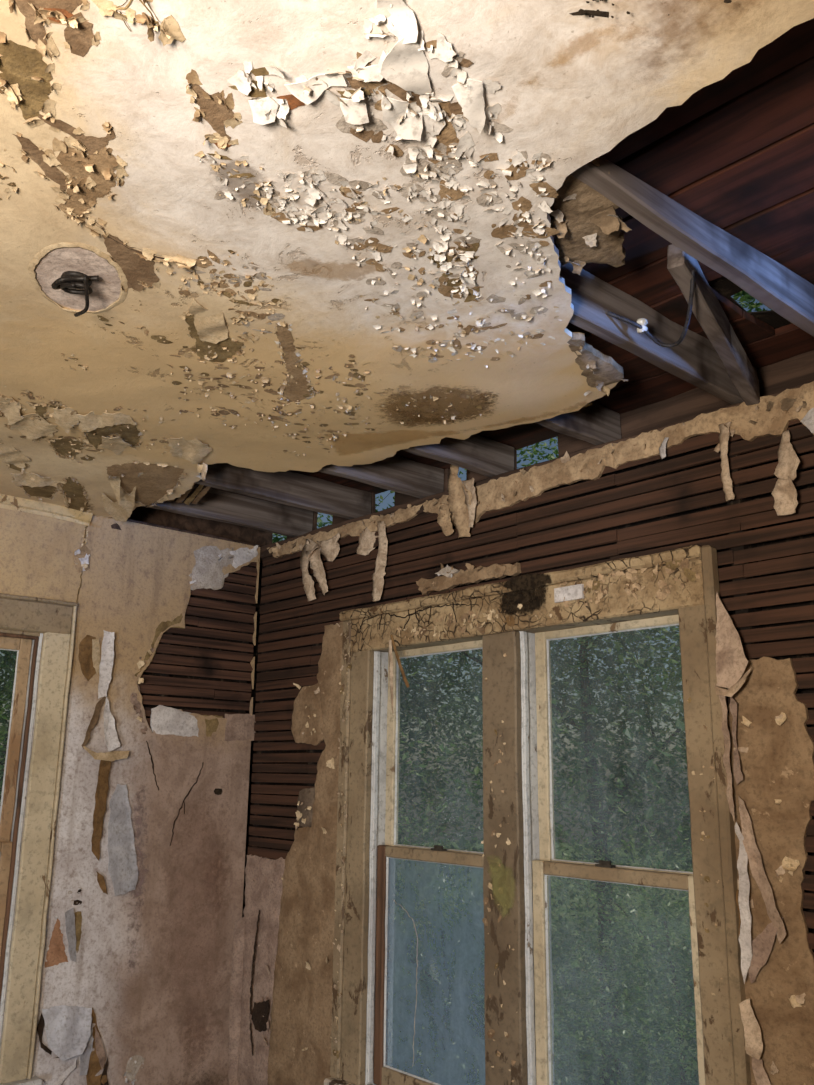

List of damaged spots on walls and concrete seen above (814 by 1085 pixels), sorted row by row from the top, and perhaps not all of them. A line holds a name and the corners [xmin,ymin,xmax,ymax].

mould [569,0,614,18]
peeling [186,0,632,368]
spalling [567,332,628,396]
damp [380,387,492,426]
peeling [559,559,700,607]
crack [360,589,479,631]
peeling [397,604,523,640]
crack [146,741,159,790]
crack [170,764,203,845]
peeling [294,801,312,830]
peeling [775,856,800,882]
peeling [788,993,806,1008]